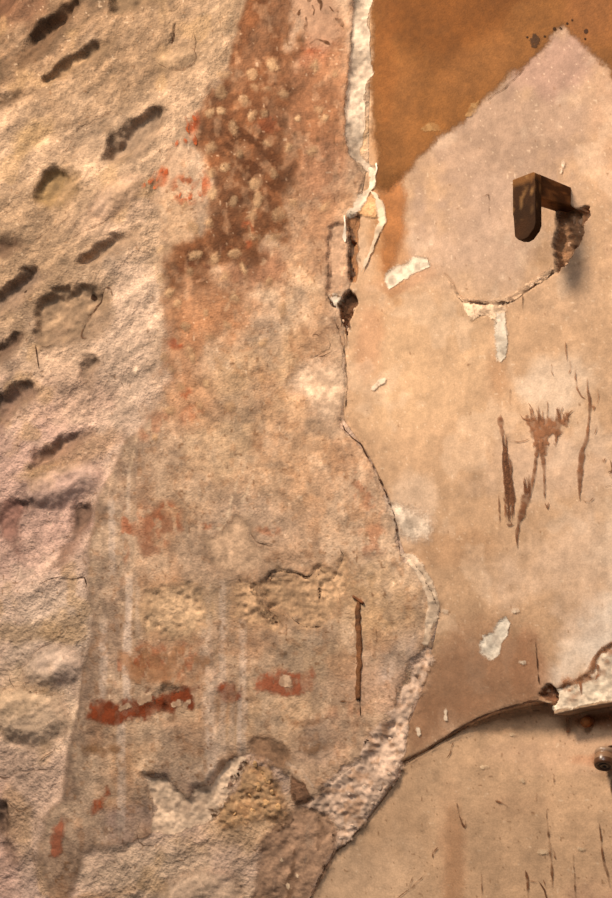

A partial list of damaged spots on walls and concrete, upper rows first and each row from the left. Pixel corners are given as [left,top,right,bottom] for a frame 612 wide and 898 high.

flaking render [293,0,386,334]
water stain [368,0,612,271]
flaking render [449,207,591,362]
flaking render [288,357,347,422]
crack [313,296,436,603]
corrosion [497,402,573,544]
corrosion [565,342,599,501]
flaking render [203,513,349,631]
flaking render [140,553,446,898]
crack [403,644,539,762]
flaking render [541,645,612,710]
corrosion [557,642,612,694]